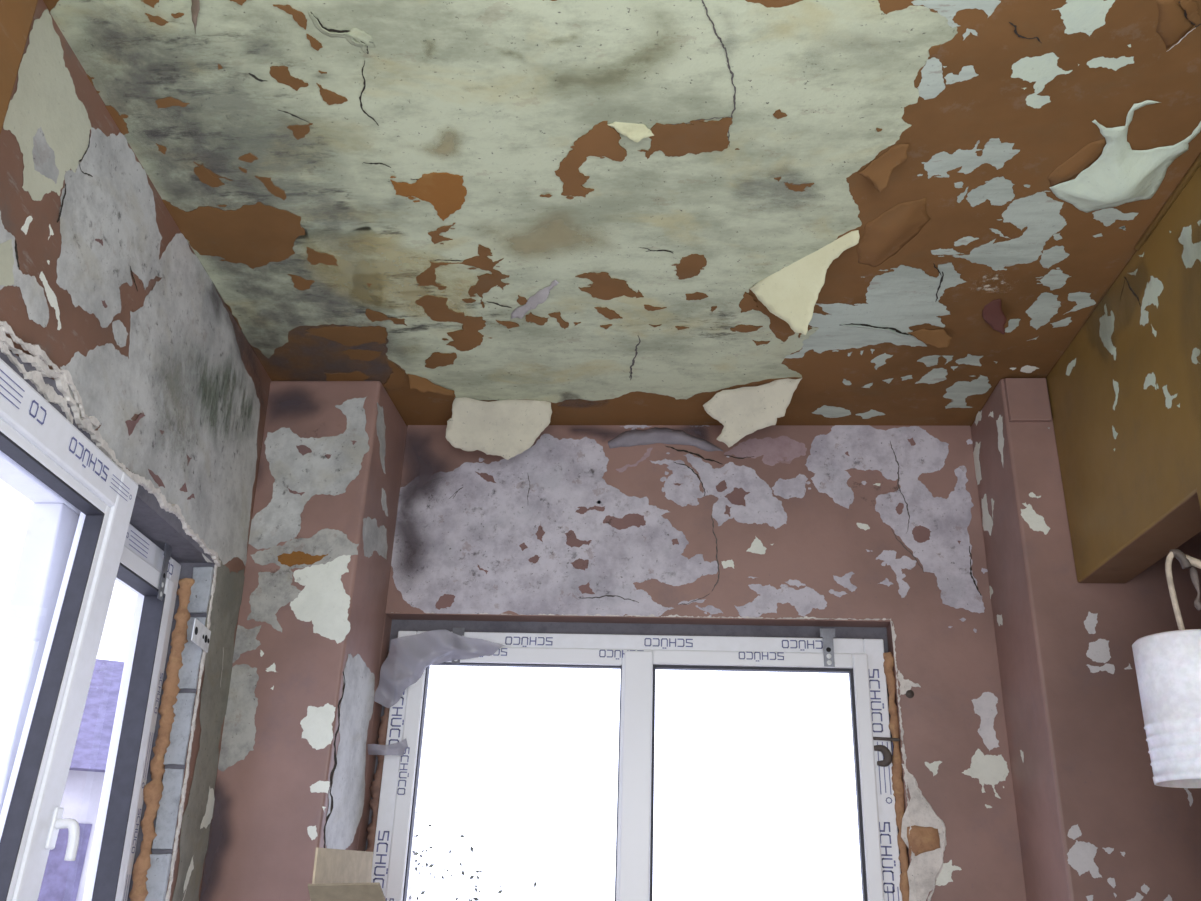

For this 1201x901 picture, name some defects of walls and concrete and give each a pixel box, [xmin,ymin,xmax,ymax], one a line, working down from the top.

leakage [102,29,266,210]
crack [308,11,379,126]
crack [672,0,736,141]
peeling [911,0,1001,28]
peeling [1011,44,1134,108]
peeling [1052,0,1115,36]
crack [1166,0,1201,52]
peeling [917,100,1201,337]
leakage [213,256,388,381]
peeling [0,0,958,901]
peeling [962,692,1009,808]
peeling [1067,824,1150,901]